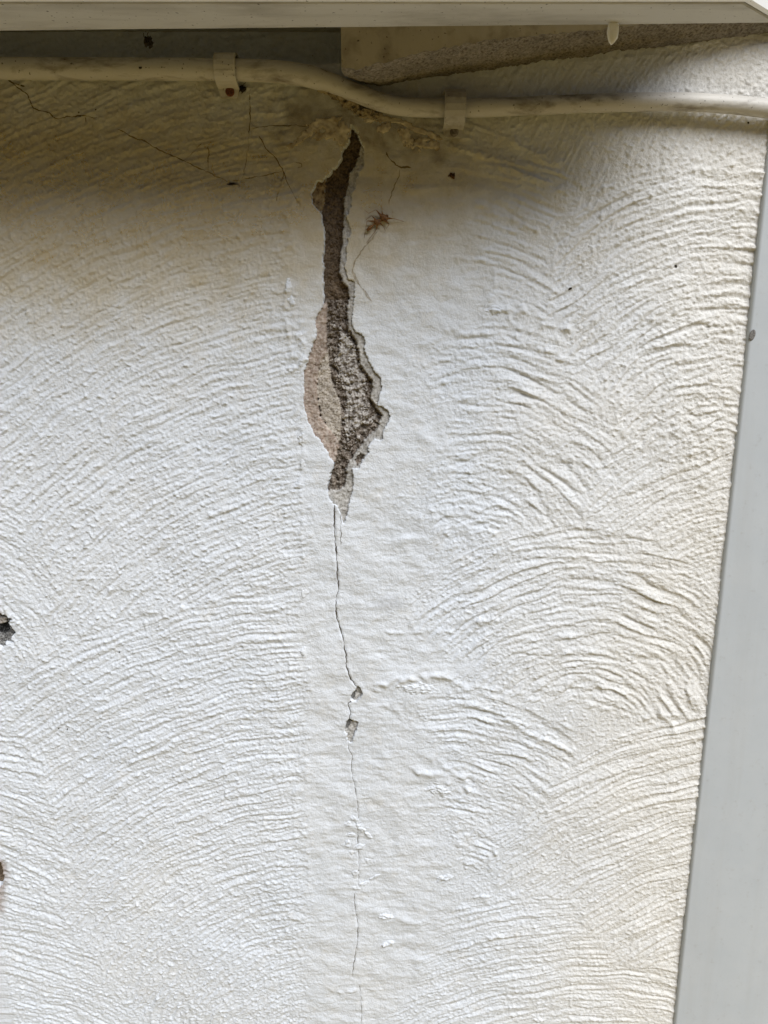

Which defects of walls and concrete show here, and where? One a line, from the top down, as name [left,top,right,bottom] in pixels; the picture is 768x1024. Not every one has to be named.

crack [8,80,411,319]
peeling [286,116,351,150]
flaking render [286,299,390,523]
crack [333,506,356,719]